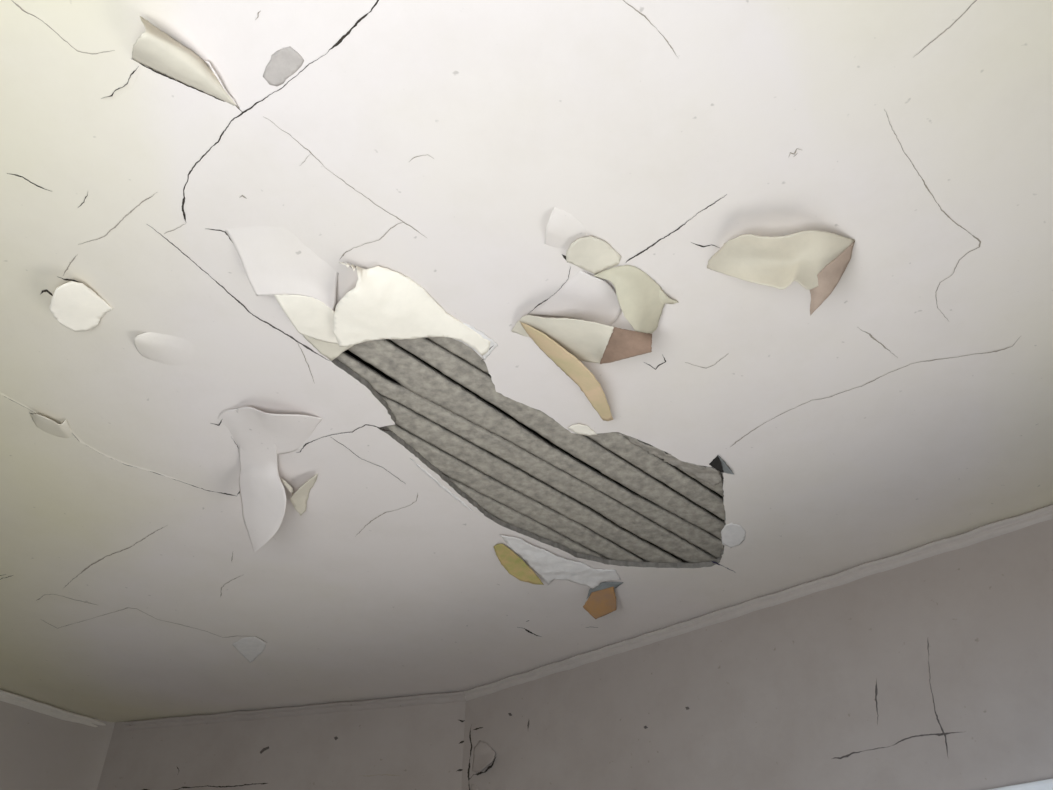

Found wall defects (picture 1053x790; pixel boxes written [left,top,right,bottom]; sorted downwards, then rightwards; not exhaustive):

peeling [263,47,304,86]
crack [623,0,679,59]
crack [915,0,977,56]
crack [12,0,424,384]
crack [626,194,727,262]
crack [885,111,981,320]
crack [297,424,418,537]
spalling [336,323,734,563]
crack [732,328,1021,446]
crack [36,527,264,641]
crack [457,720,496,790]
crack [832,641,966,759]